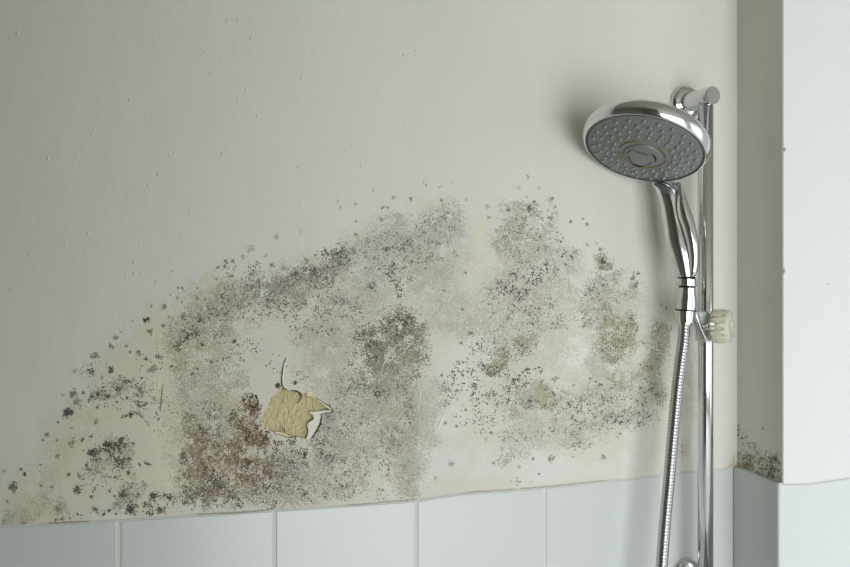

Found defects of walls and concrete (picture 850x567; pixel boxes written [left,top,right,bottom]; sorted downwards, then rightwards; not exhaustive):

flaking render [261,357,331,440]
leakage [0,183,677,525]
leakage [677,351,698,459]
leakage [727,425,782,482]